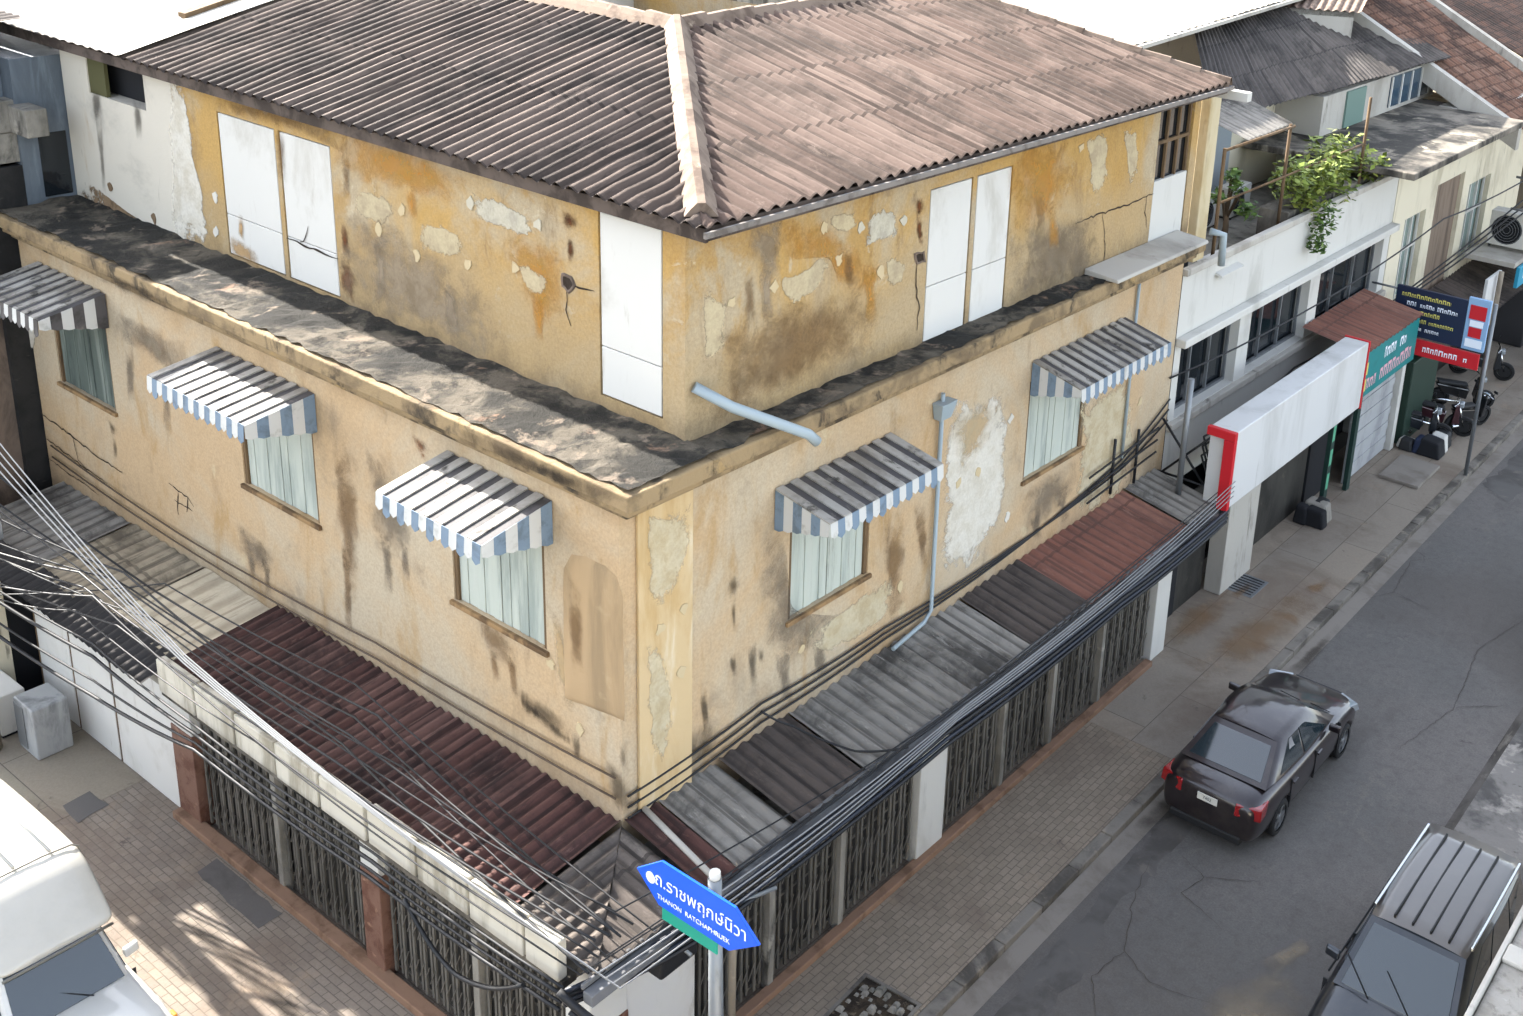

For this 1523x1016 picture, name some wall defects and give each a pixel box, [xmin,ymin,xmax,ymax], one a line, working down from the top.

crack [287,228,338,259]
peeling [355,192,405,237]
damp [363,229,474,331]
peeling [413,226,472,270]
damp [518,251,551,331]
peeling [512,261,593,326]
peeling [769,253,843,303]
peeling [820,214,865,235]
damp [511,455,569,484]
peeling [956,409,988,488]
peeling [648,516,689,615]
peeling [648,624,686,756]